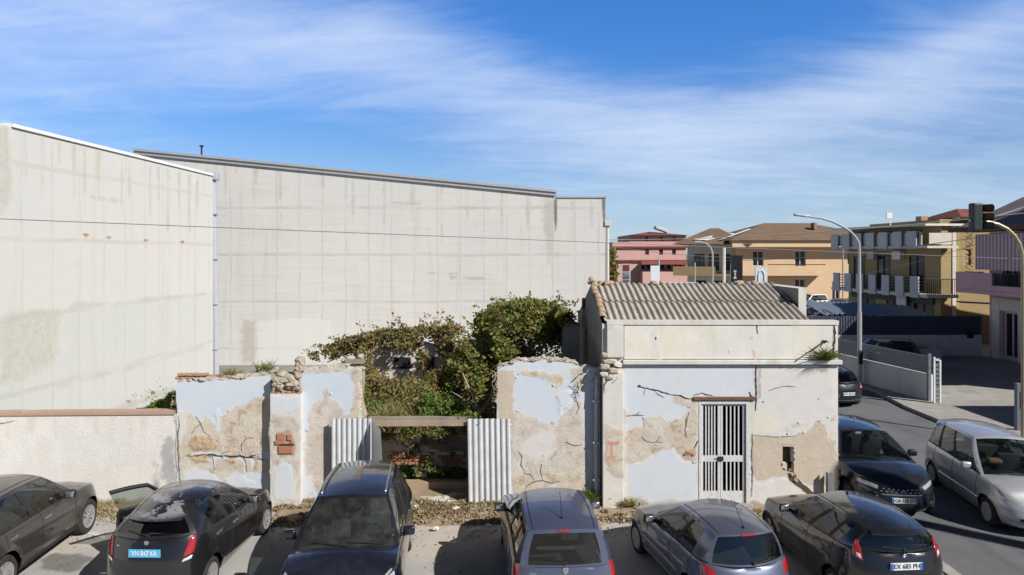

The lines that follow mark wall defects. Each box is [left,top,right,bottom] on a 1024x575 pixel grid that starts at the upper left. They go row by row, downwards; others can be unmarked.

damp [0,127,13,215]
crack [177,417,263,480]
peeling [175,367,361,493]
crack [519,452,559,489]
peeling [496,367,587,494]
peeling [605,394,698,480]
crack [626,387,713,443]
peeling [748,416,839,494]